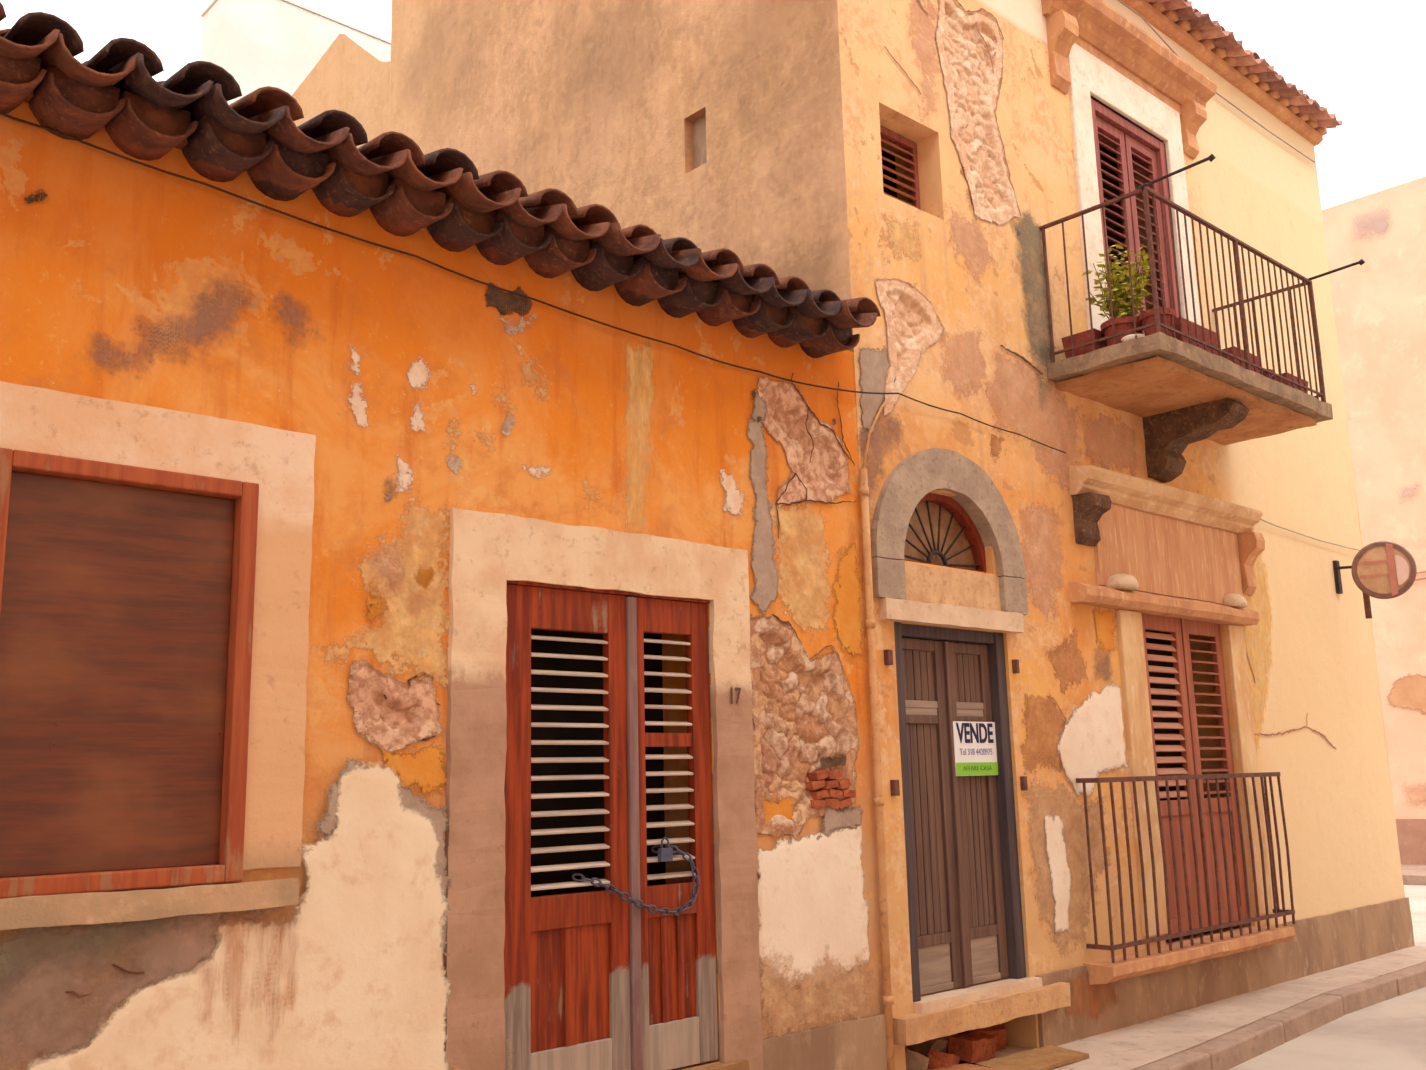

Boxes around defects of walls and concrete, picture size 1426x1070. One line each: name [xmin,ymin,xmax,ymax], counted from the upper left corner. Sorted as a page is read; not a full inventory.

flaking render [909,0,1021,282]
mould [94,284,248,366]
peeling [347,344,369,428]
peeling [407,356,431,432]
spalling [445,283,548,475]
peeling [521,464,550,479]
flaking render [875,278,1137,490]
flaking render [27,455,453,1070]
flaking render [750,377,874,1038]
flaking render [1020,607,1129,955]
flaking render [1387,674,1426,714]